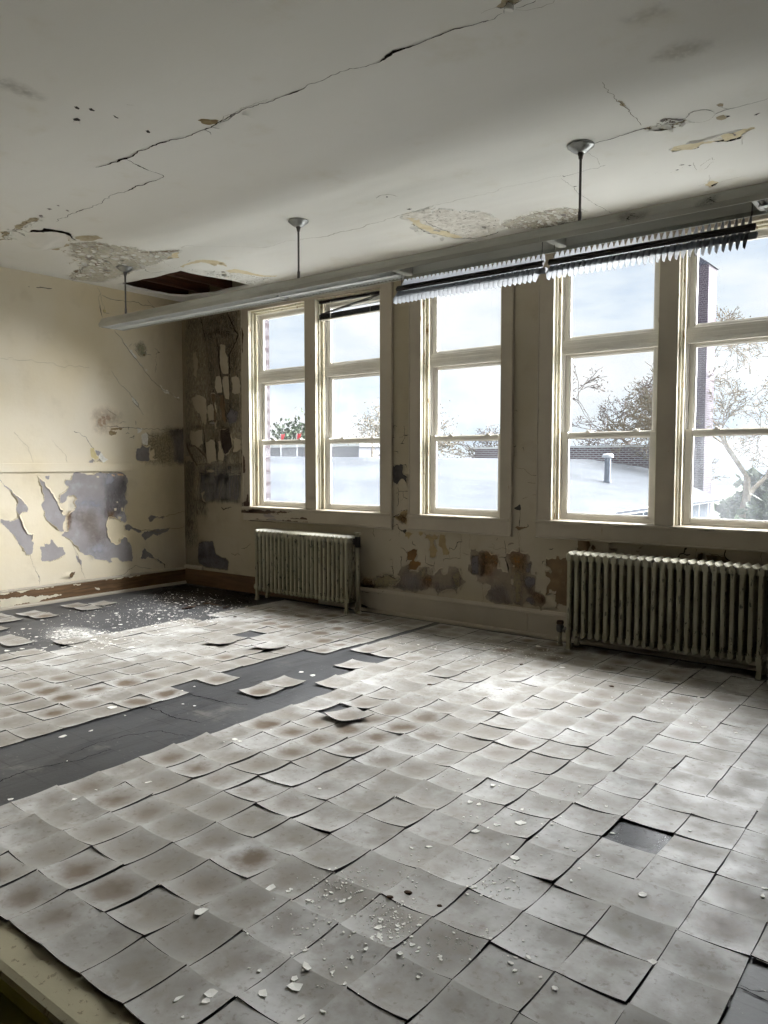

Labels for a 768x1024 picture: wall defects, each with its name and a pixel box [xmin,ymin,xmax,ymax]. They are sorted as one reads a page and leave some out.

crack [56,20,489,222]
crack [561,82,676,212]
flaking render [644,118,690,132]
flaking render [668,103,759,152]
flaking render [0,205,68,240]
flaking render [399,207,582,242]
flaking render [51,235,275,285]
peeling [220,428,245,473]
peeling [393,463,408,488]
peeling [0,430,229,590]
peeling [392,503,567,611]
peeling [0,586,61,608]